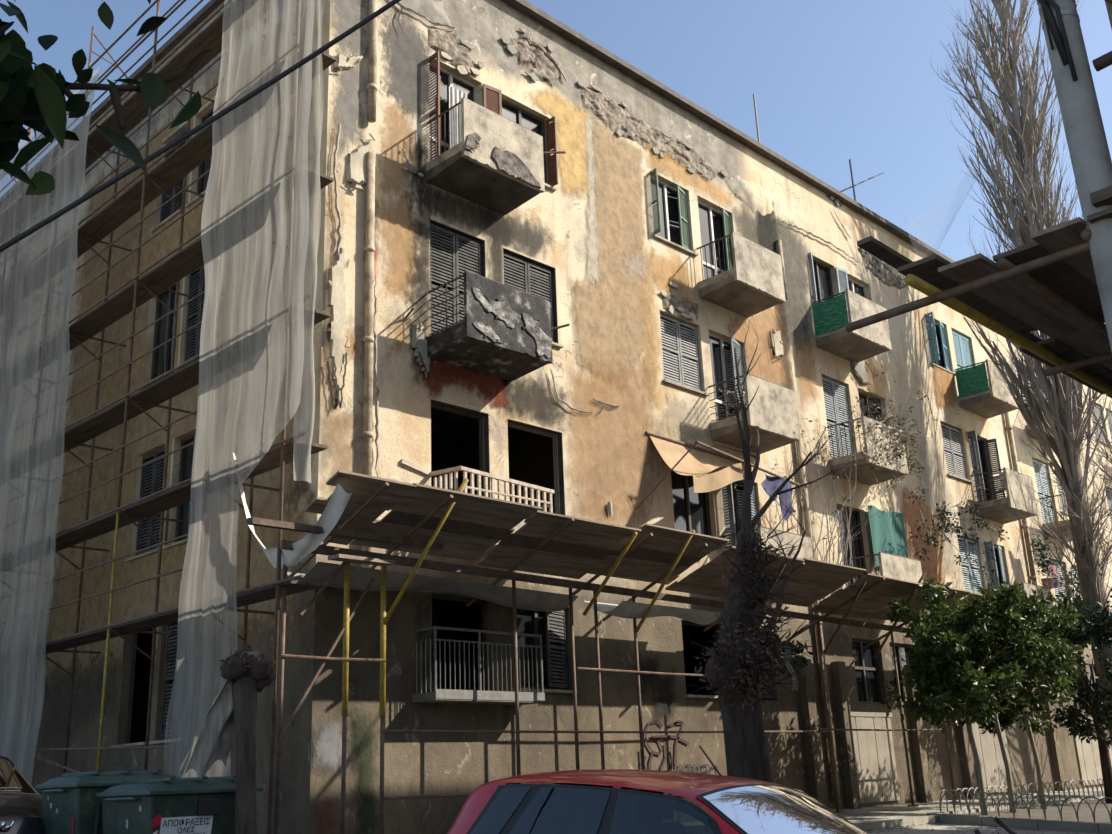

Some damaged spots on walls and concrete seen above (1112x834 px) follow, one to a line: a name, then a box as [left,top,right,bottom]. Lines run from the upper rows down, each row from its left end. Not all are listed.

spalling [428,28,484,77]
spalling [501,28,563,89]
crack [333,124,343,261]
spalling [463,132,542,188]
spalling [578,80,728,282]
peeling [325,246,350,409]
flaking render [411,323,507,406]
spalling [472,287,554,358]
spalling [660,281,698,320]
flaking render [904,488,944,585]